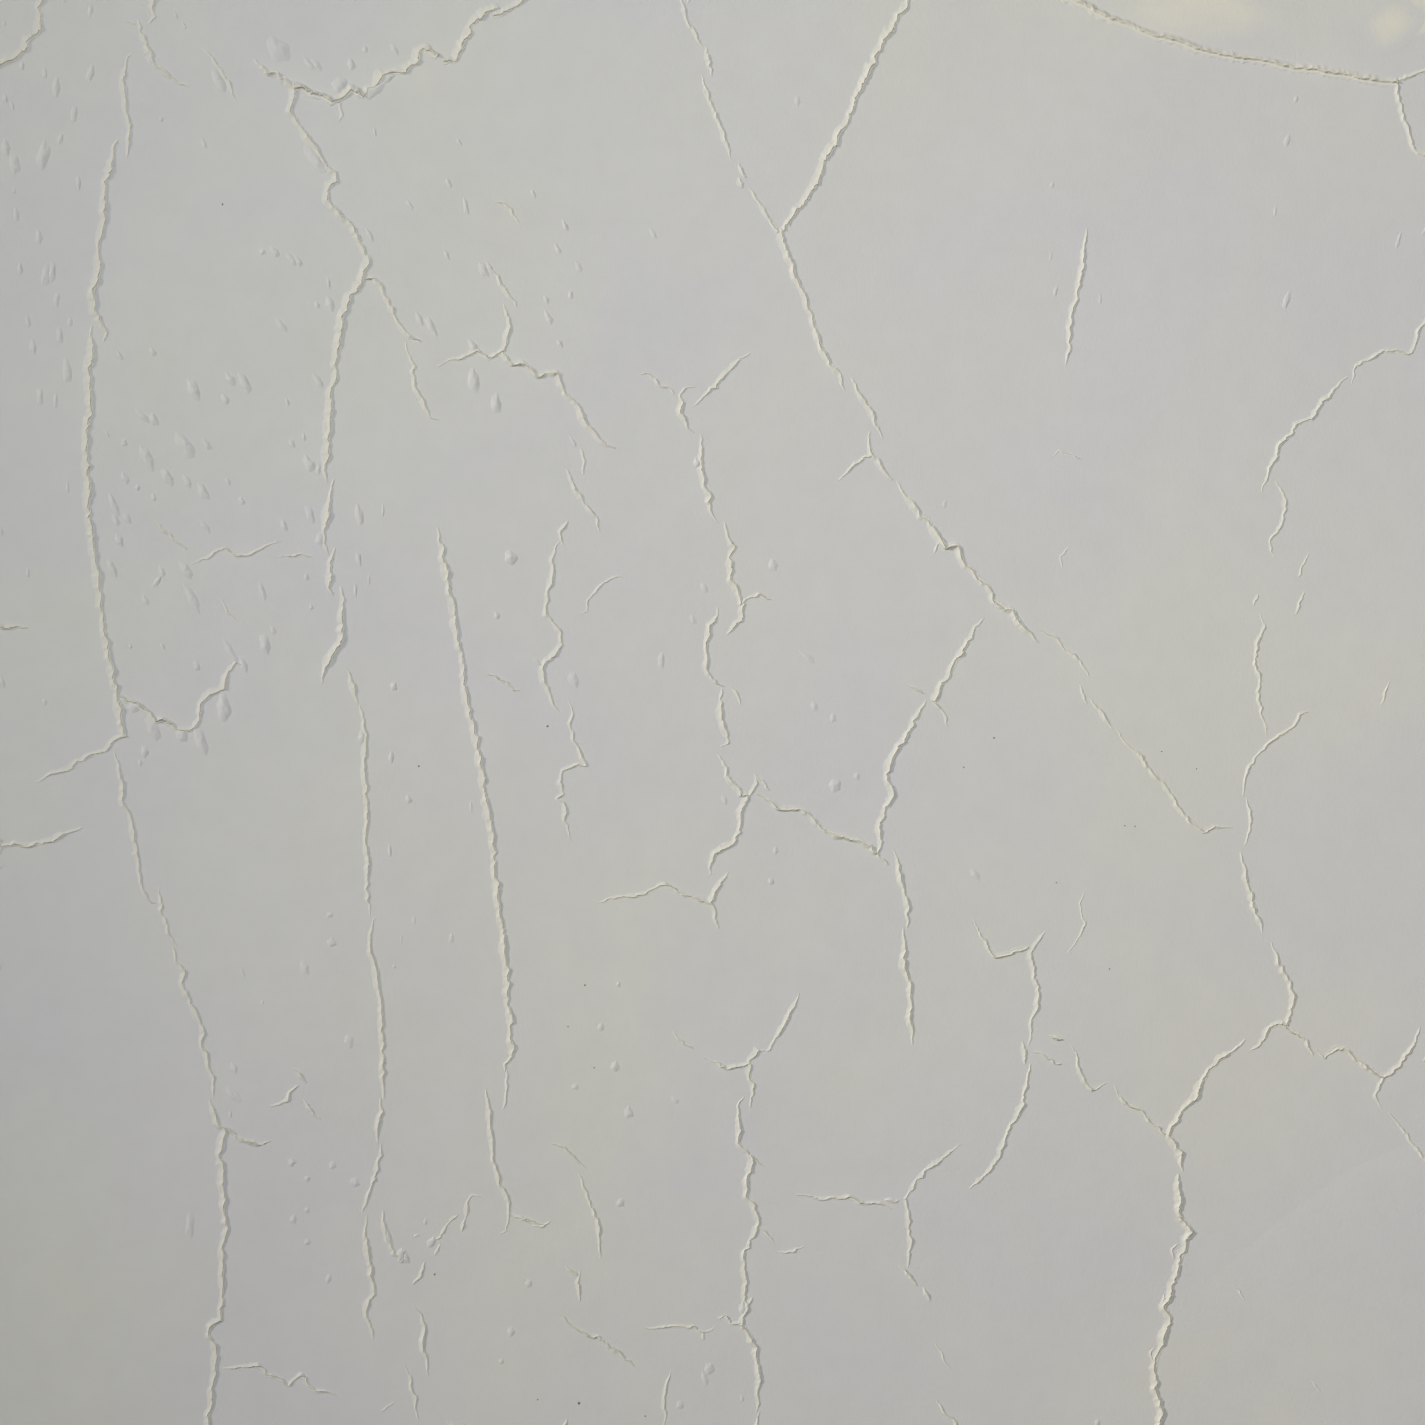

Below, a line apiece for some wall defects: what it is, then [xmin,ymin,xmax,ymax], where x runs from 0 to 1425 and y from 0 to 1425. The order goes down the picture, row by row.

crack [0,0,47,71]
crack [0,622,27,630]
crack [37,0,634,1425]
crack [598,0,1425,1425]
crack [0,827,83,869]